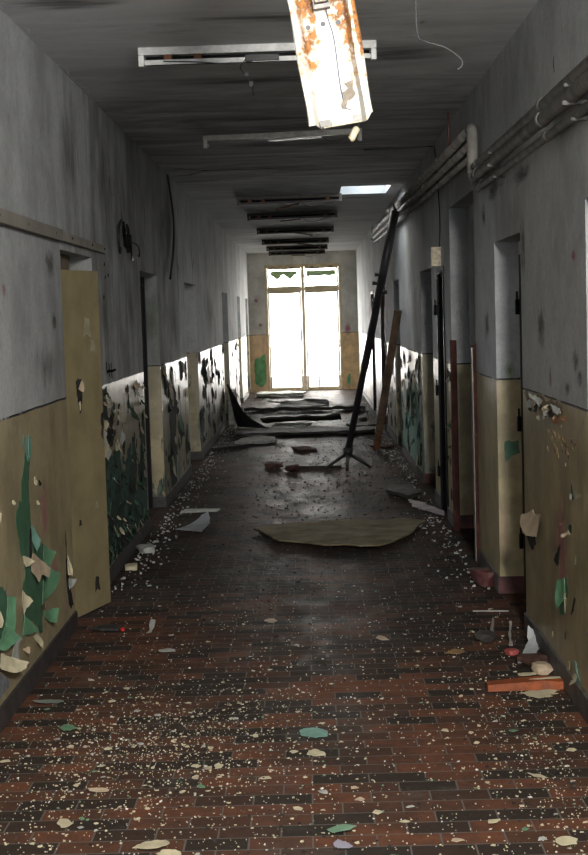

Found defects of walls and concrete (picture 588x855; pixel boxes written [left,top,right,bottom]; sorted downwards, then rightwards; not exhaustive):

peeling [101,380,151,568]
peeling [162,359,191,488]
peeling [199,341,241,442]
peeling [386,350,424,470]
peeling [524,390,565,425]
peeling [0,436,60,698]